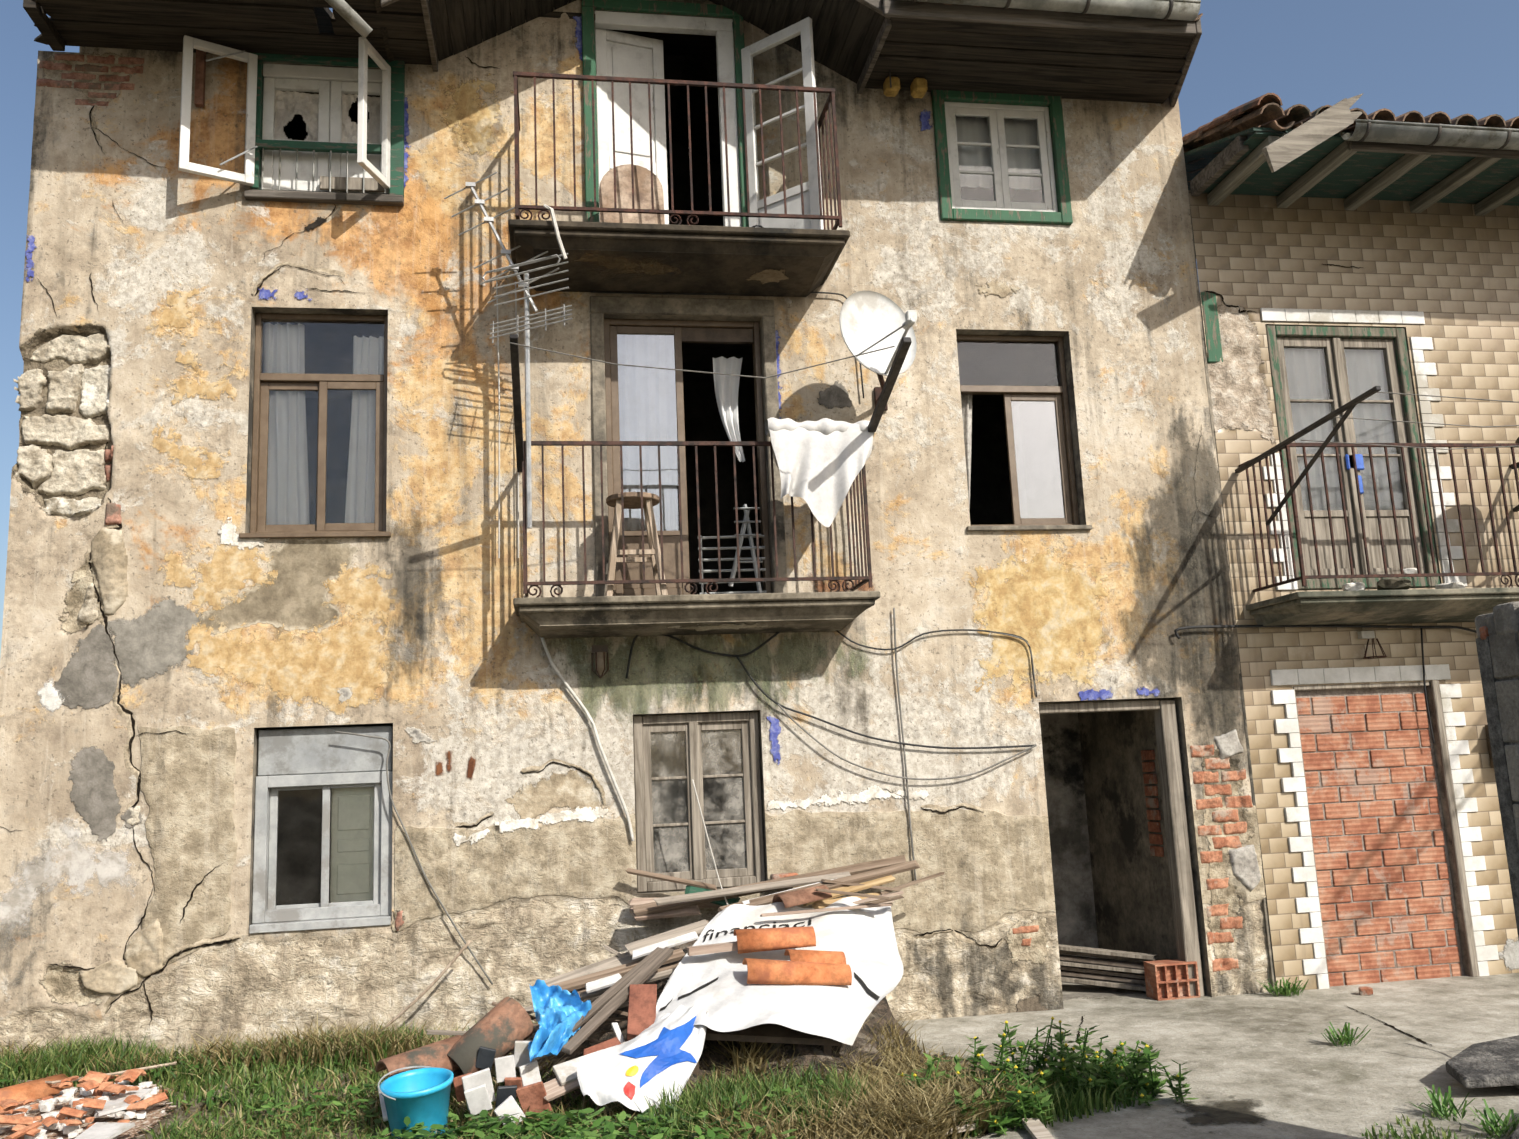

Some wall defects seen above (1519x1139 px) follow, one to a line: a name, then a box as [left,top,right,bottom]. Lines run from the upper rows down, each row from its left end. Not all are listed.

flaking render [37,52,144,106]
crack [89,104,166,168]
crack [251,204,361,295]
flaking render [11,323,122,525]
crack [44,429,241,1026]
flaking render [453,769,608,846]
flaking render [766,785,930,811]
flaking render [1190,729,1261,975]